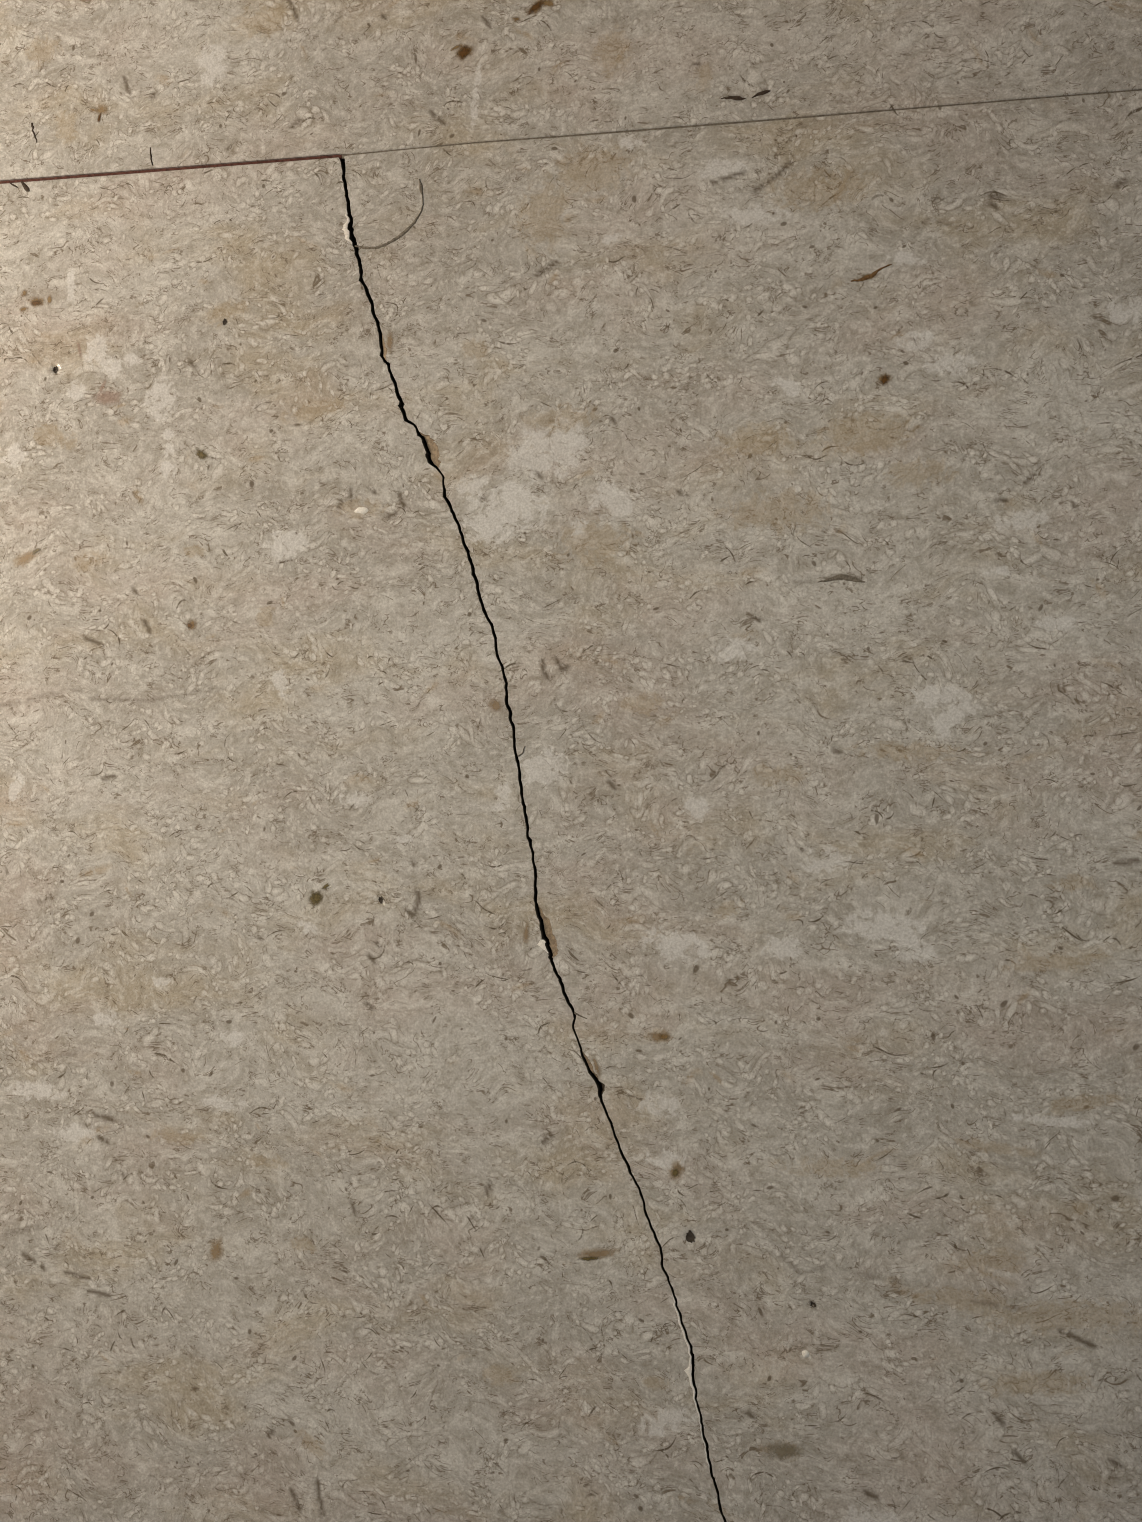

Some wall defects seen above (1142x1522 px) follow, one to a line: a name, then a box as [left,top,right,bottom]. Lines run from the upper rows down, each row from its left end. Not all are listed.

crack [851,264,892,282]
crack [818,574,865,583]
crack [339,158,727,1522]